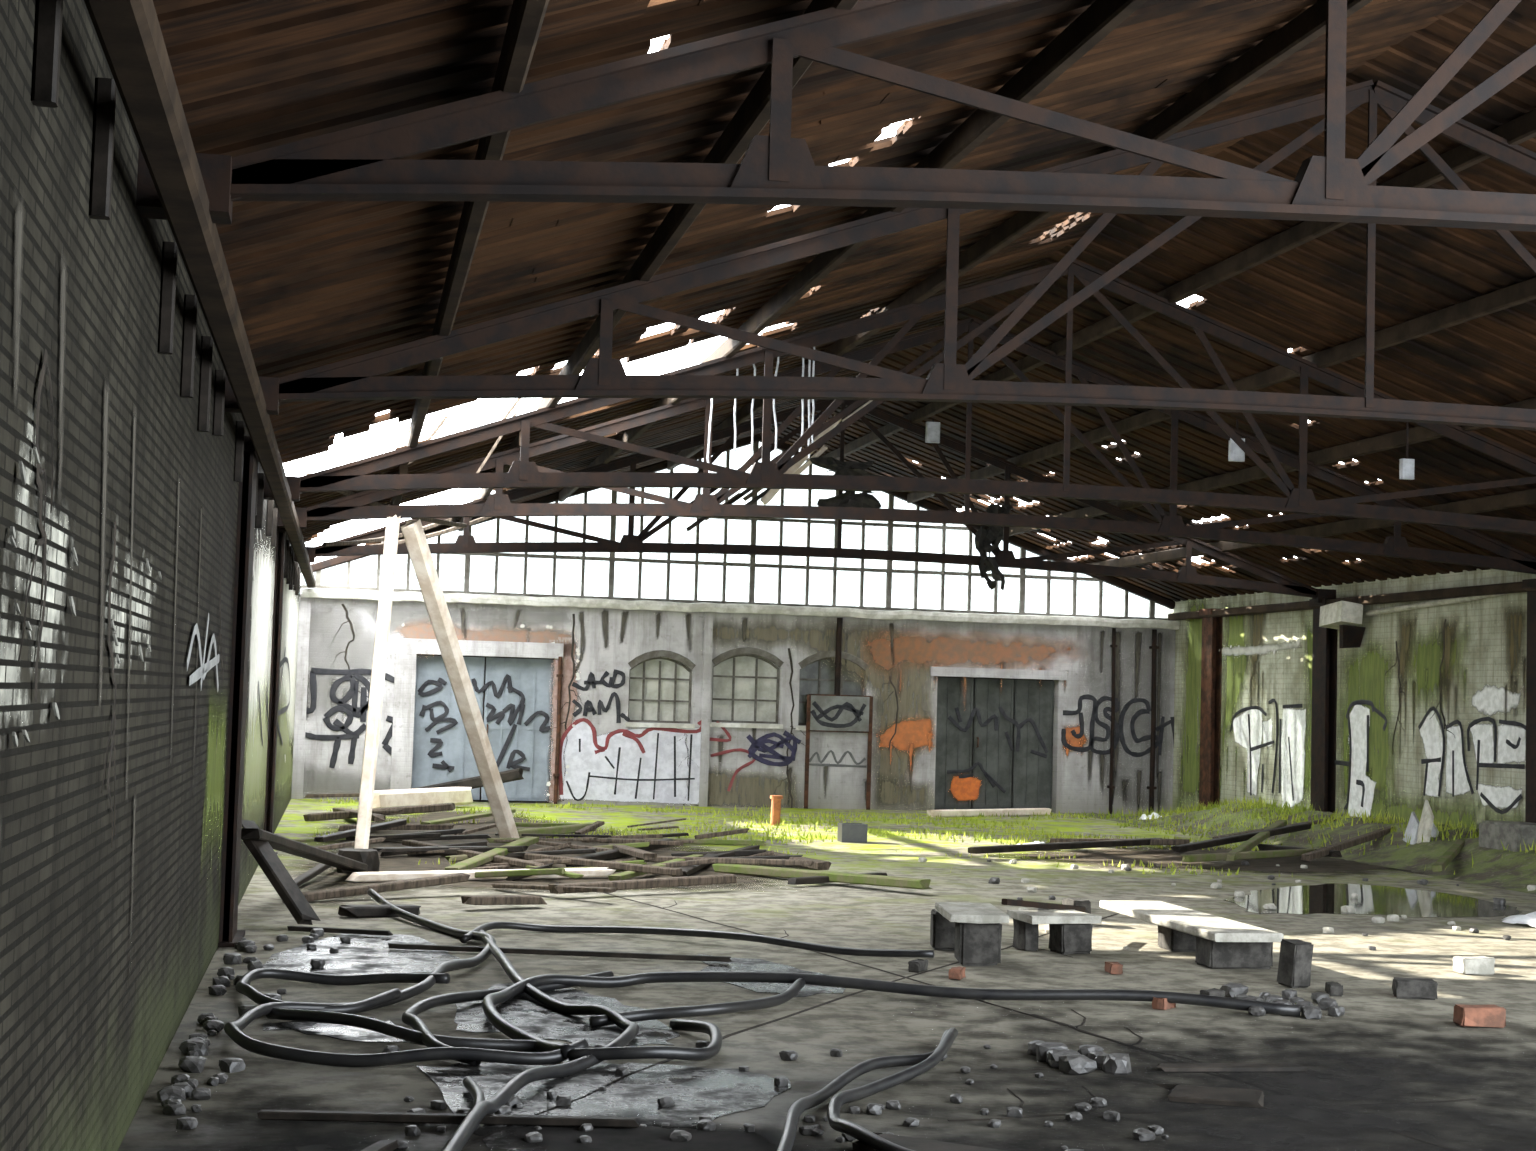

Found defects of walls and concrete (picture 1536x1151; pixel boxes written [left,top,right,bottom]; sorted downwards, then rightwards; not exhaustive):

leakage [1341,617,1523,828]
leakage [1505,608,1526,725]